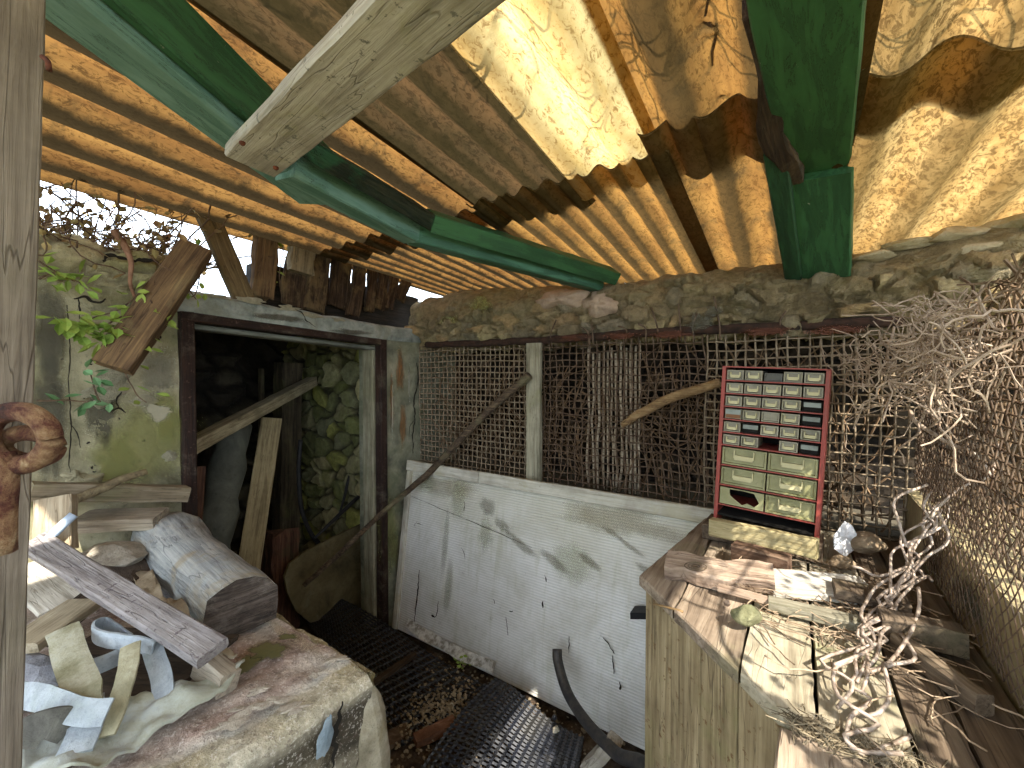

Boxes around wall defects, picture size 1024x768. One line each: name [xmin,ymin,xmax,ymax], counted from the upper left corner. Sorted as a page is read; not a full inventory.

leakage [87,397,115,439]
corrosion [390,354,405,443]